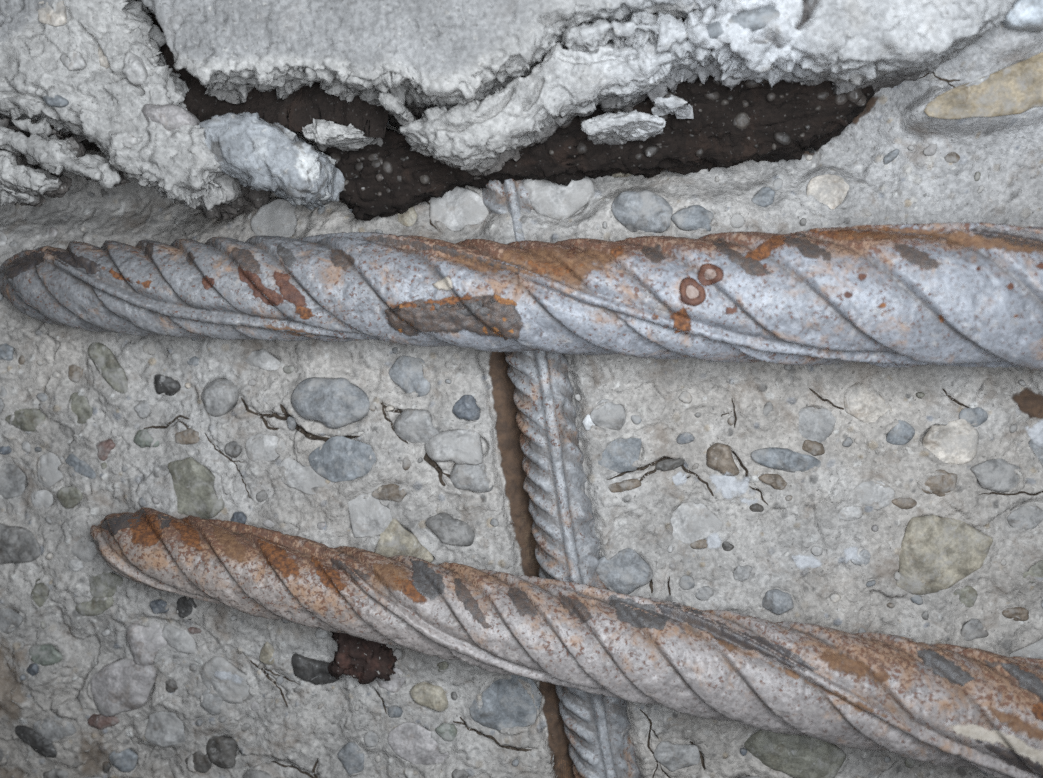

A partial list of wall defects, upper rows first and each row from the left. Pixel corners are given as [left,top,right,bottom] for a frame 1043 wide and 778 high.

crack [918,72,960,88]
spalling [0,118,130,207]
peeling [894,243,938,270]
rust [810,226,1043,269]
rust [238,266,322,336]
rust [652,263,724,334]
rust [385,277,540,577]
peeling [411,559,491,628]
peeling [609,595,818,671]
crack [272,759,318,778]
rust [539,681,575,778]
peeling [976,739,1043,778]